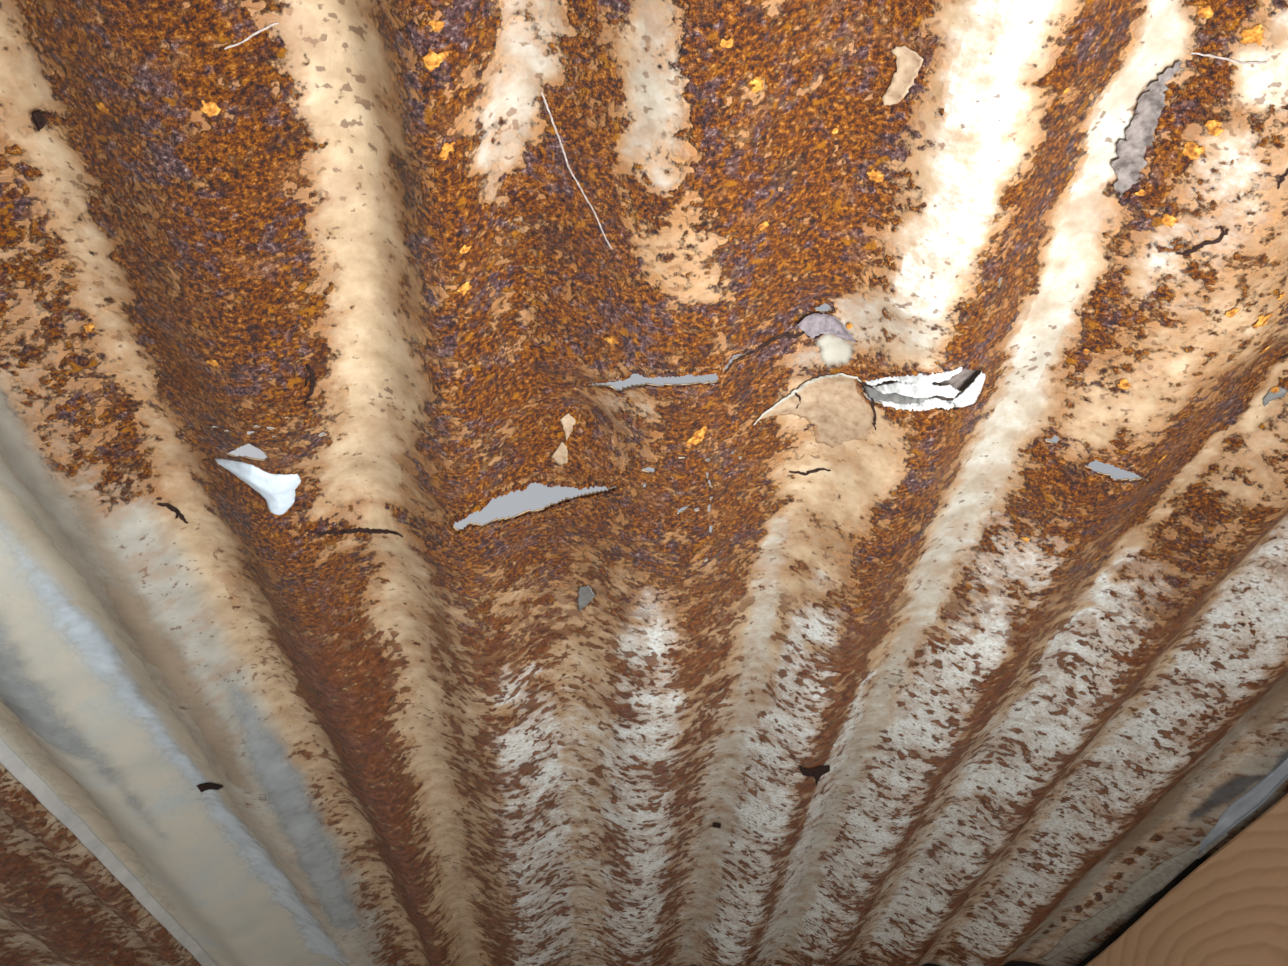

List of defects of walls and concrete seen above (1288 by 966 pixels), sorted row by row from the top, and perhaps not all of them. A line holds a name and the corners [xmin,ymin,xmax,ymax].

peeling [1111,61,1185,197]
crack [1277,169,1288,190]
peeling [796,313,858,365]
corrosion [0,0,459,966]
crack [316,527,403,538]
corrosion [370,0,1288,966]